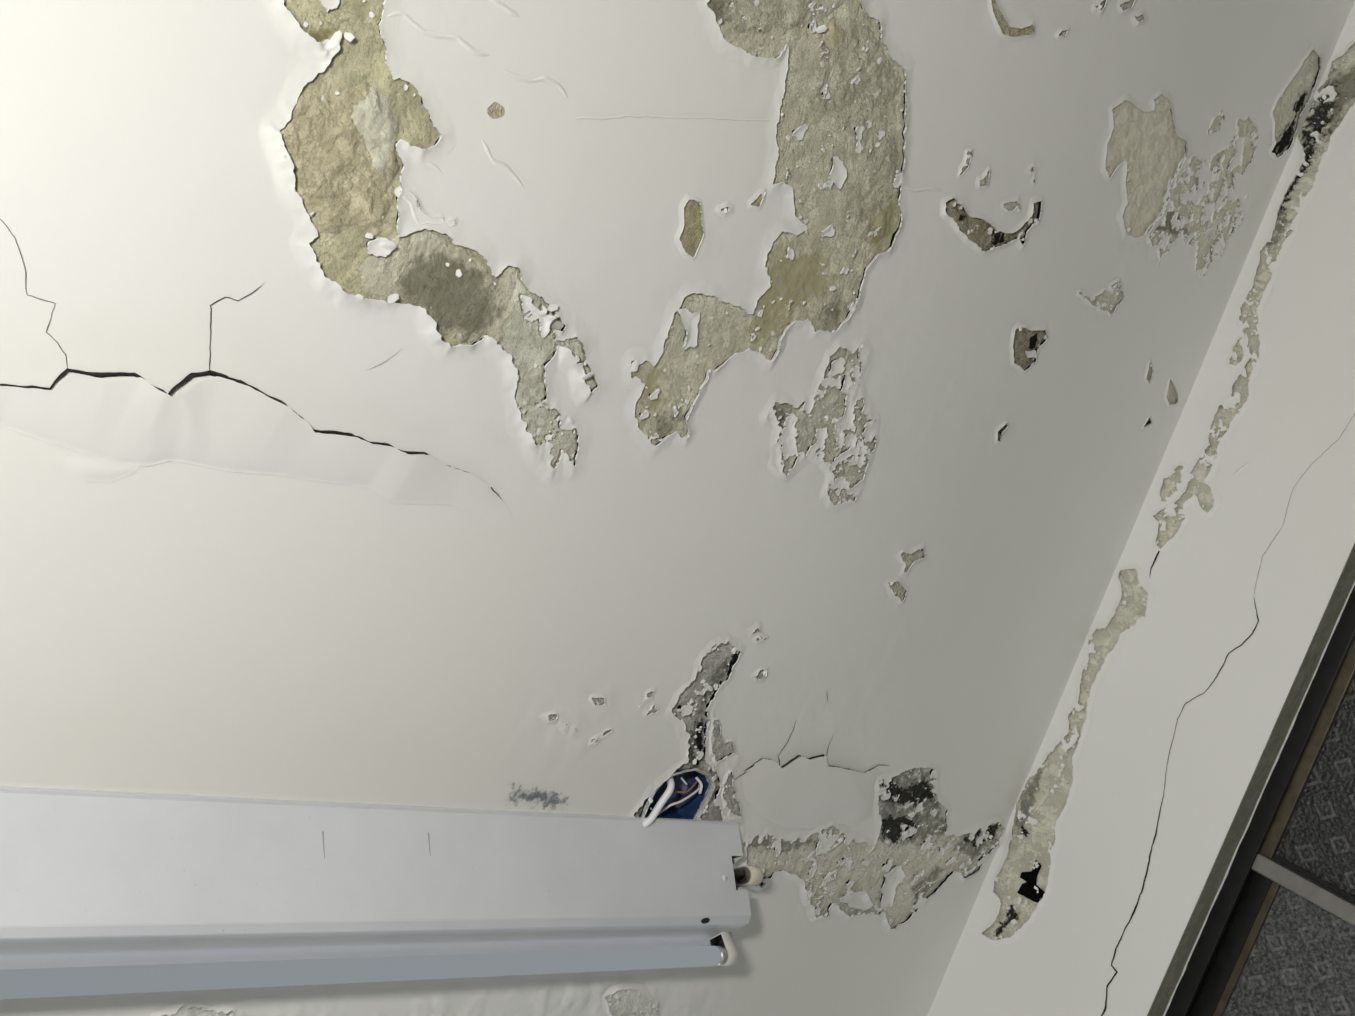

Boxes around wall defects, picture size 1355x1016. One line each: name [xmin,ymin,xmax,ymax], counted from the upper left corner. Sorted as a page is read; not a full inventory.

peeling [255,0,916,514]
peeling [955,146,992,192]
flaking render [939,162,1045,257]
peeling [1076,277,1126,319]
peeling [1099,37,1355,555]
crack [0,219,504,502]
flaking render [1009,321,1050,377]
crack [735,722,888,780]
peeling [627,563,1155,947]
crack [1101,413,1355,1016]
peeling [149,997,248,1016]
peeling [601,981,662,1016]